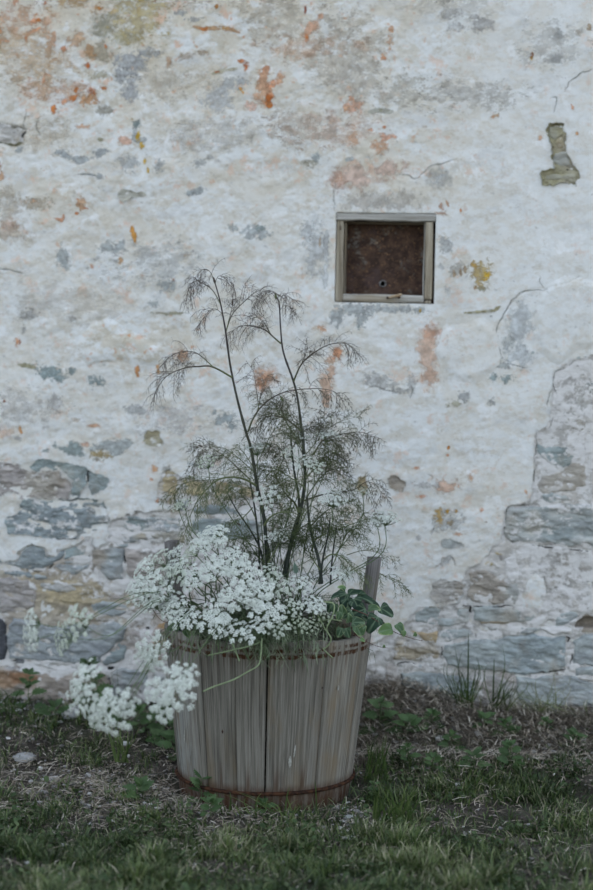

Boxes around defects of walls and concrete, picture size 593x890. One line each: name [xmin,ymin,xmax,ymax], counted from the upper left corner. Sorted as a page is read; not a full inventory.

flaking render [540,123,580,186]
crack [496,279,544,368]
flaking render [0,430,297,703]
flaking render [361,354,593,715]